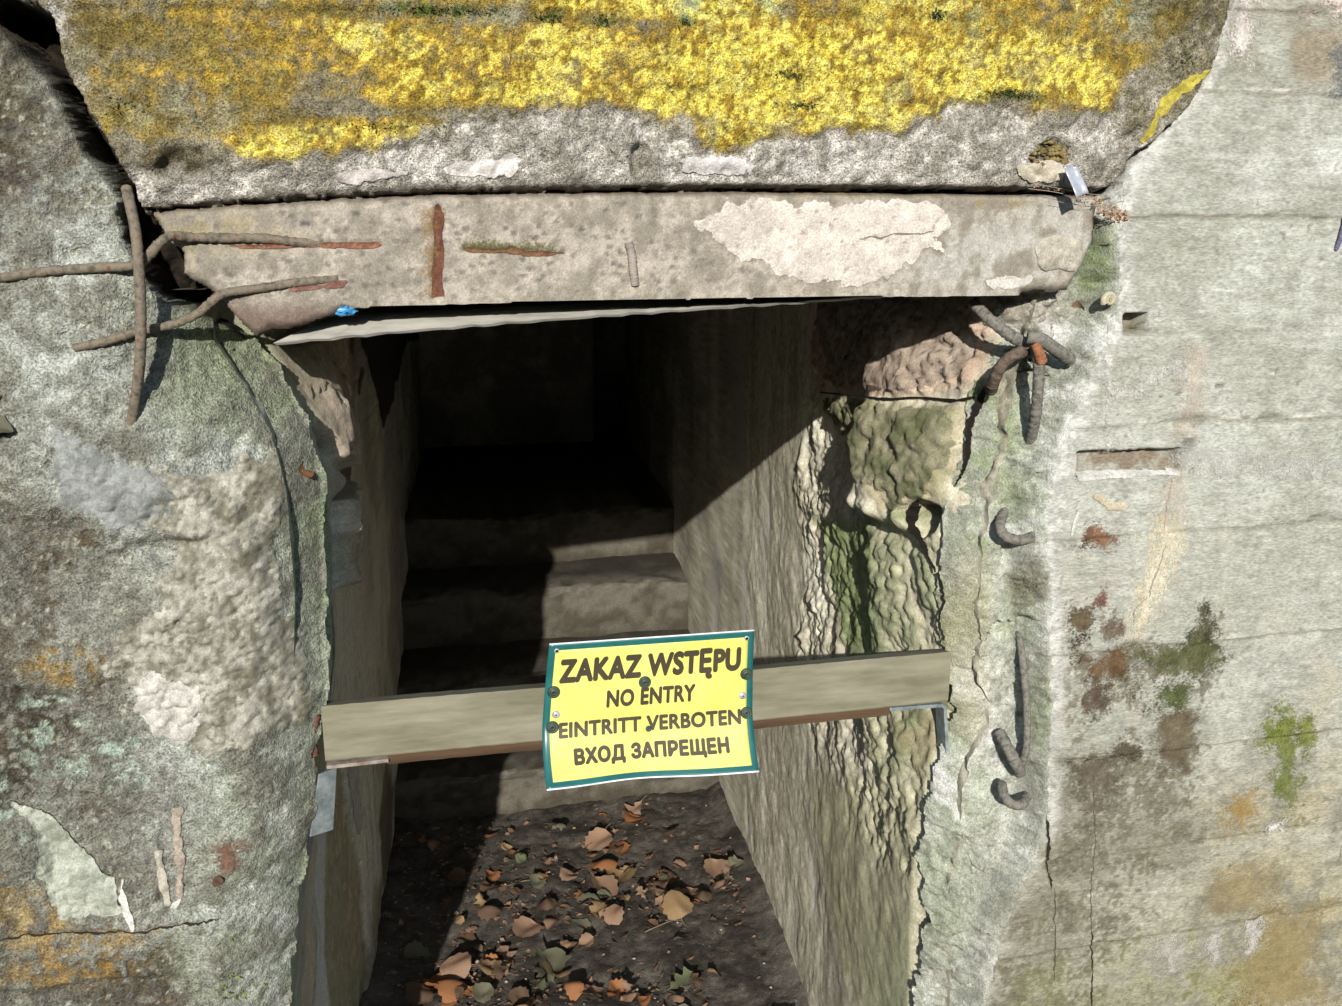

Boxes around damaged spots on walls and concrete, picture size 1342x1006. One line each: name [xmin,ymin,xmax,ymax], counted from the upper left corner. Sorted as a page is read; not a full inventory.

rust [289,280,347,292]
rust [431,204,444,297]
rust [462,240,565,256]
peeling [694,188,951,288]
crack [820,387,986,486]
crack [906,500,946,642]
spalling [912,67,1213,1006]
damp [1065,507,1234,826]
damp [1266,712,1318,834]
crack [0,919,219,941]
crack [1046,820,1056,978]
damp [1244,916,1265,954]